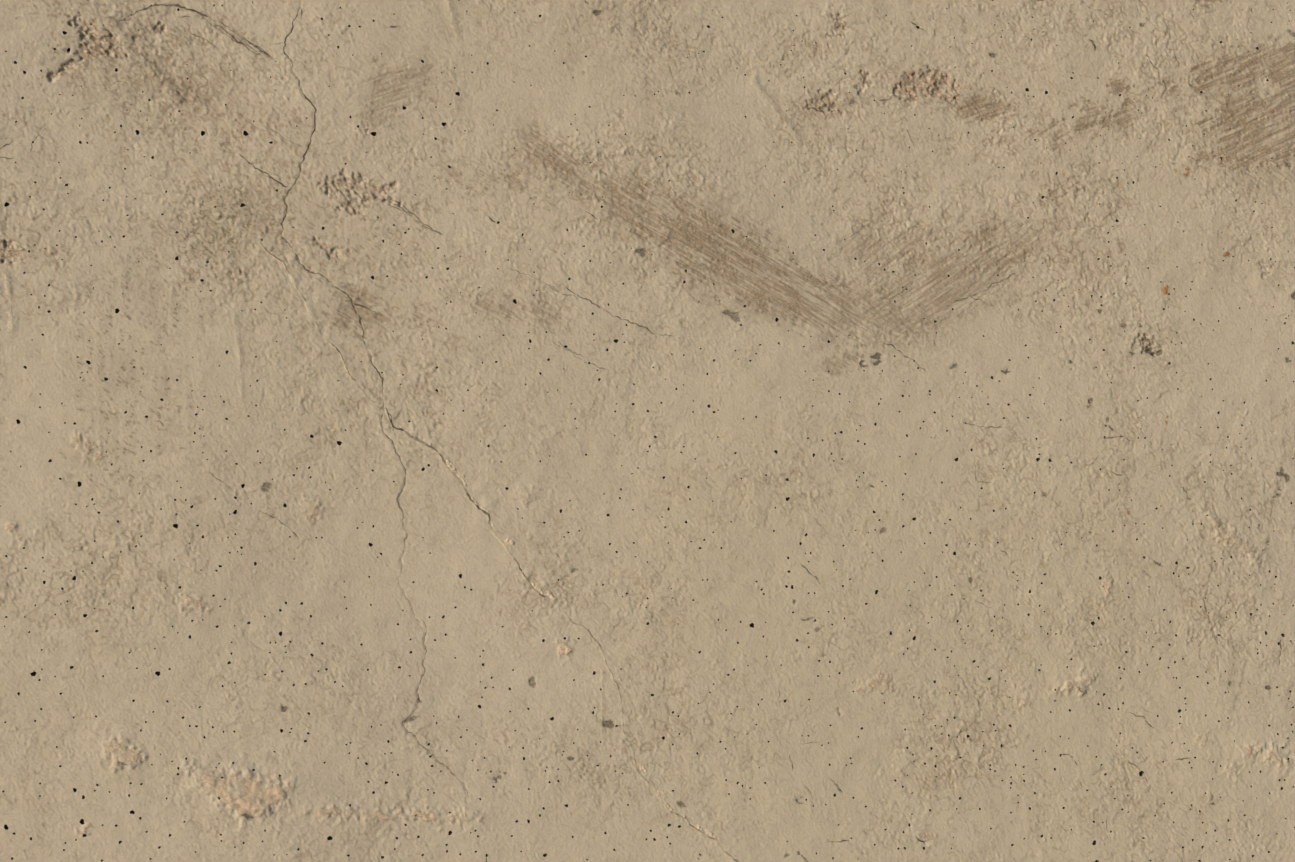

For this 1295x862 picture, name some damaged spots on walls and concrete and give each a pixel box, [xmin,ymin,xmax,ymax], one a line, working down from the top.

crack [242,9,316,272]
crack [333,291,556,600]